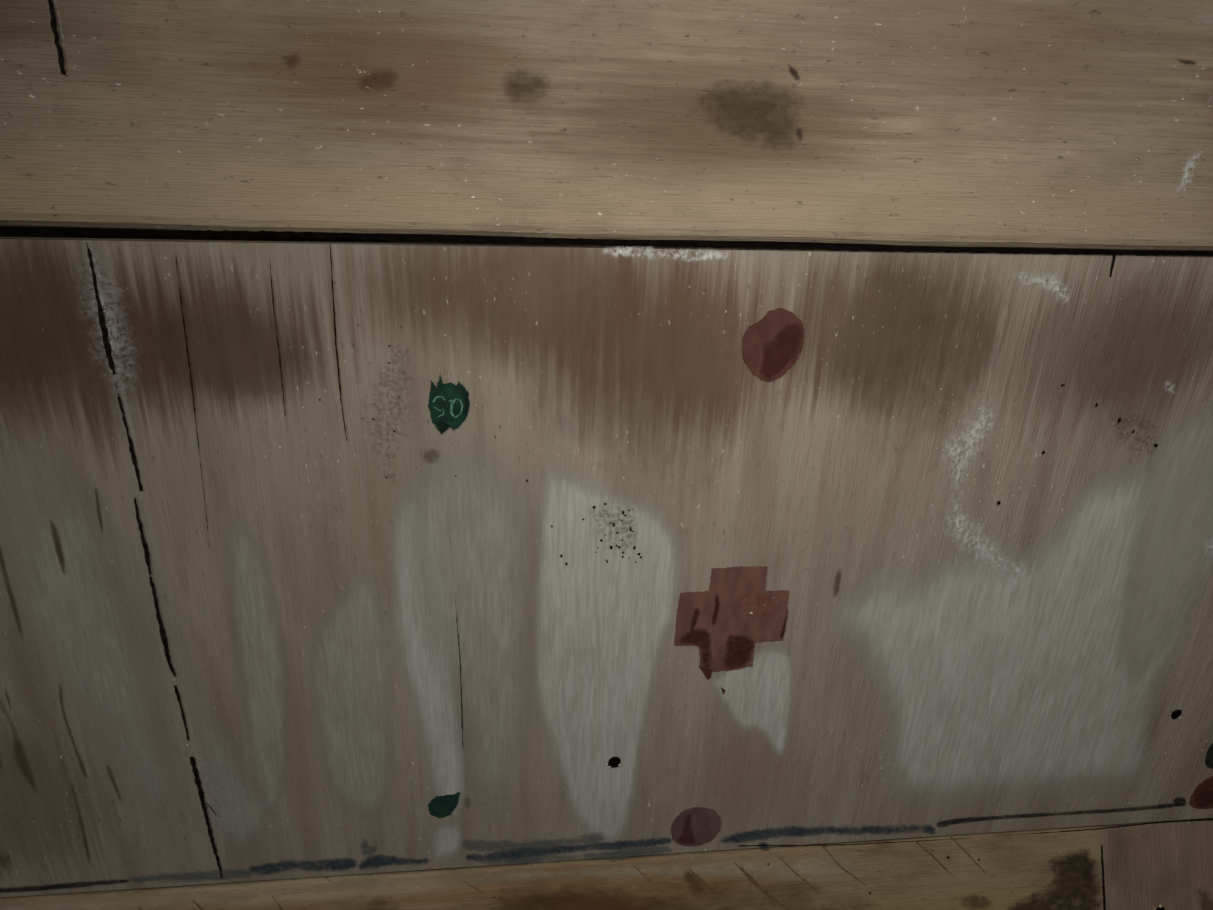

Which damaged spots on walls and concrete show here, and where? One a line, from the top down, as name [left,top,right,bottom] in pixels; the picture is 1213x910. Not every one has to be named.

crack [32,0,68,75]
water stain [52,526,64,571]
crack [86,234,226,881]
water stain [1012,852,1100,910]